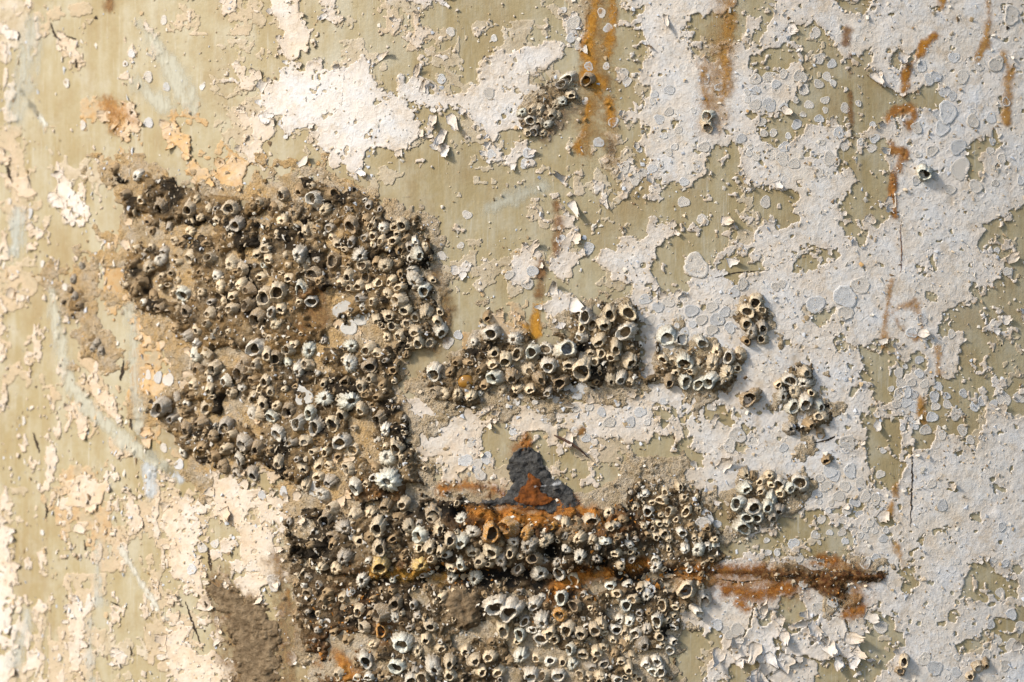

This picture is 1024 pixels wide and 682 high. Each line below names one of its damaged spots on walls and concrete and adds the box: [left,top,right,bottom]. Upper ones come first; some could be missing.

peeling [0,0,98,71]
peeling [157,0,639,224]
corrosion [573,0,617,155]
corrosion [885,32,938,130]
corrosion [1001,53,1015,126]
corrosion [888,142,909,218]
peeling [441,198,590,343]
peeling [508,0,1024,682]
peeling [0,125,309,682]
peeling [416,404,505,492]
corrosion [438,434,602,526]
corrosion [678,555,886,618]